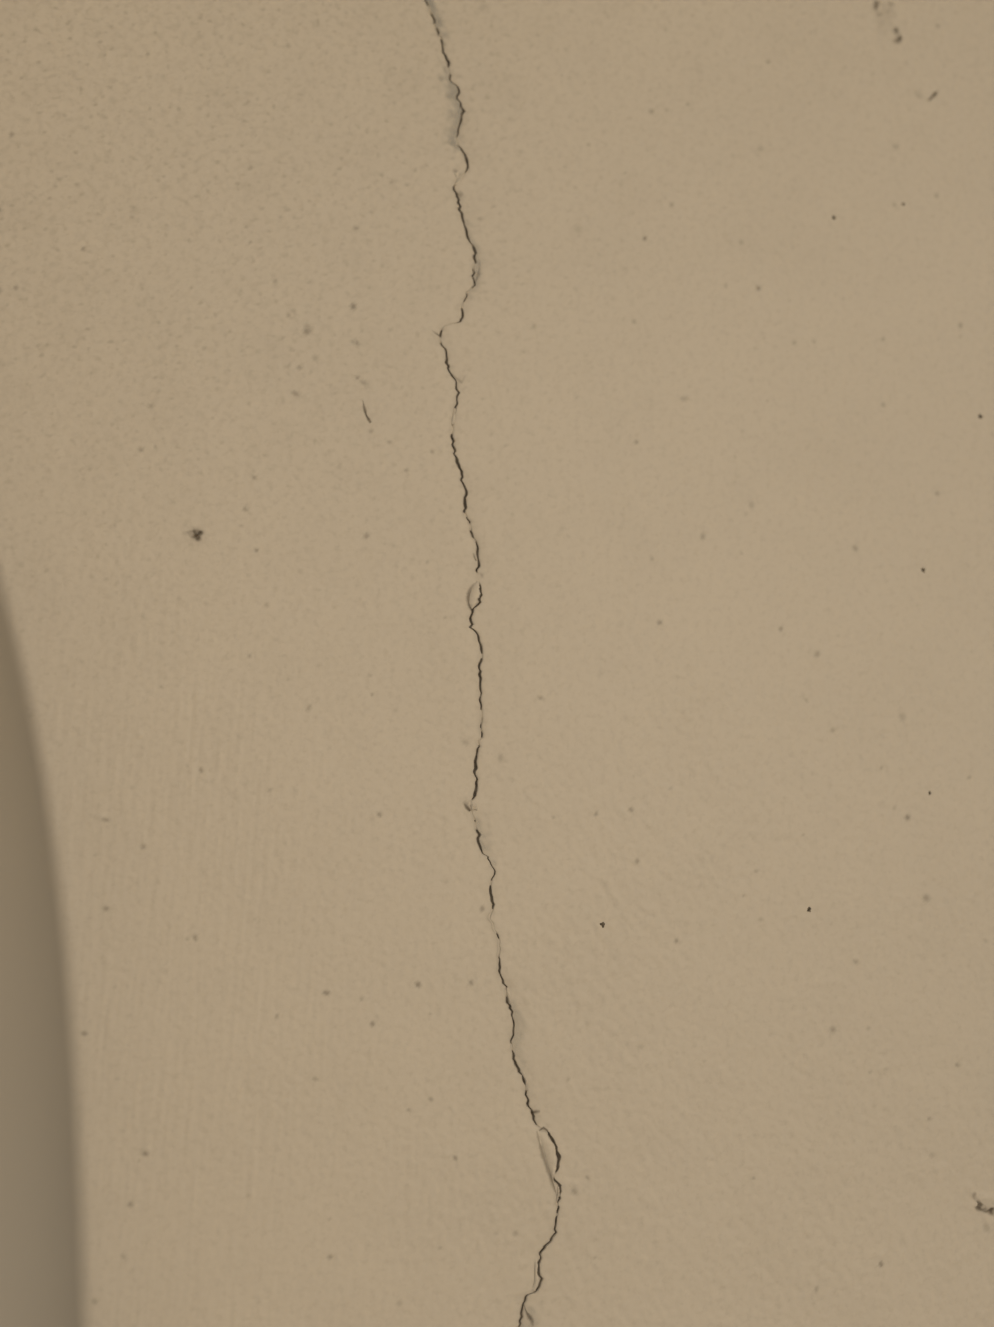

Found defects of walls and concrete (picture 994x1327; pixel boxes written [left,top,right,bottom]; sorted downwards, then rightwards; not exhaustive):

crack [425,0,561,1327]